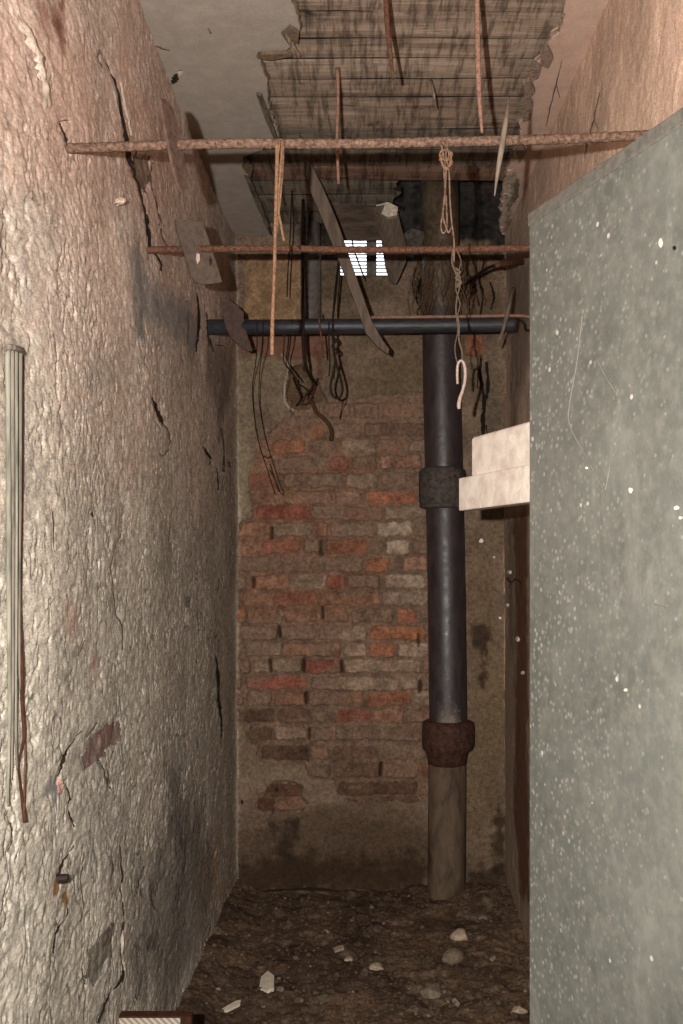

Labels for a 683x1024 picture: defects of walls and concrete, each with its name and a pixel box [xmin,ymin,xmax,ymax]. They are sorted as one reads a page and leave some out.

crack [97,50,168,271]
spalling [65,0,649,254]
crack [151,397,171,456]
crack [203,428,231,490]
flaking render [236,353,429,813]
spalling [82,721,122,770]
crack [215,640,223,745]
crack [52,722,111,957]
crack [82,846,155,1024]